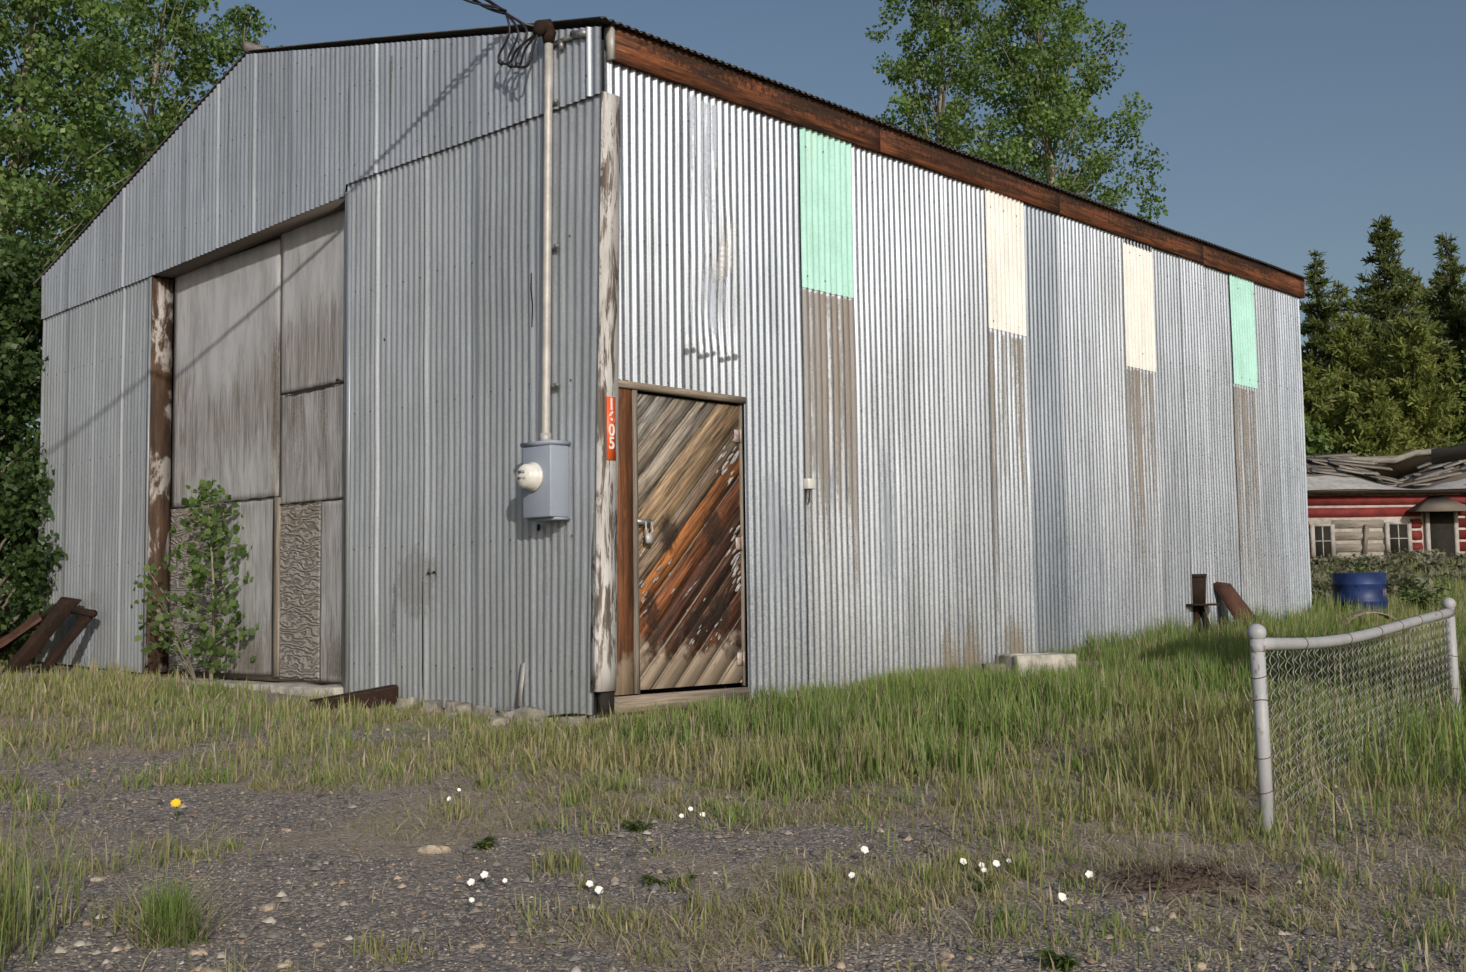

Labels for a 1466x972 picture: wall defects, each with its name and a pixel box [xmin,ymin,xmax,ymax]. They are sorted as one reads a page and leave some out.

rust [802,289,859,528]
rust [989,332,1024,581]